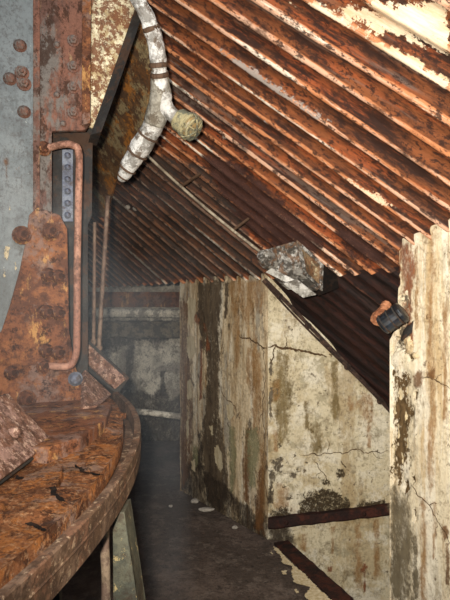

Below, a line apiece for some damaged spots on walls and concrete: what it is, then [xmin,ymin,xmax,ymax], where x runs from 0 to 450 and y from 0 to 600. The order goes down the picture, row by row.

peeling [306,0,450,89]
corrosion [202,155,324,253]
corrosion [334,222,388,268]
crack [238,334,326,520]
leakage [181,279,419,600]
crack [299,439,388,481]
spalling [389,369,418,494]
crack [412,486,449,541]